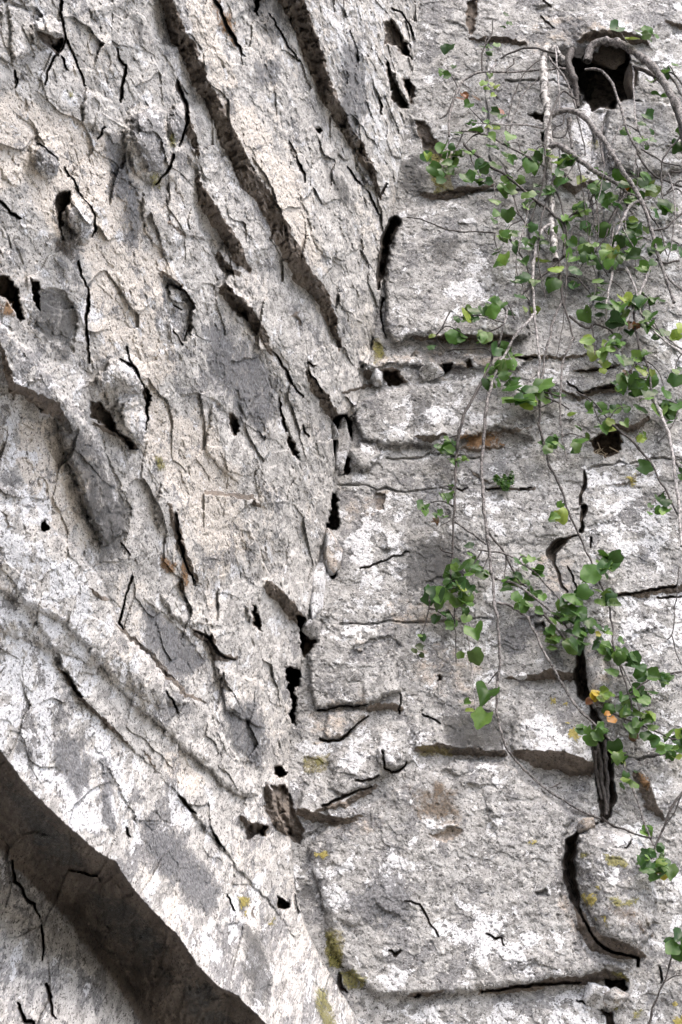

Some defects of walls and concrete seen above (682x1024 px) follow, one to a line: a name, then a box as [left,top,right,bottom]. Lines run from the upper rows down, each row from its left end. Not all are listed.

crack [45,0,85,86]
crack [347,167,398,338]
crack [77,261,90,363]
spalling [89,395,147,450]
crack [120,346,149,431]
crack [546,470,592,593]
crack [317,704,369,743]
spalling [270,785,305,844]
crack [563,650,663,981]
crack [11,860,56,1024]